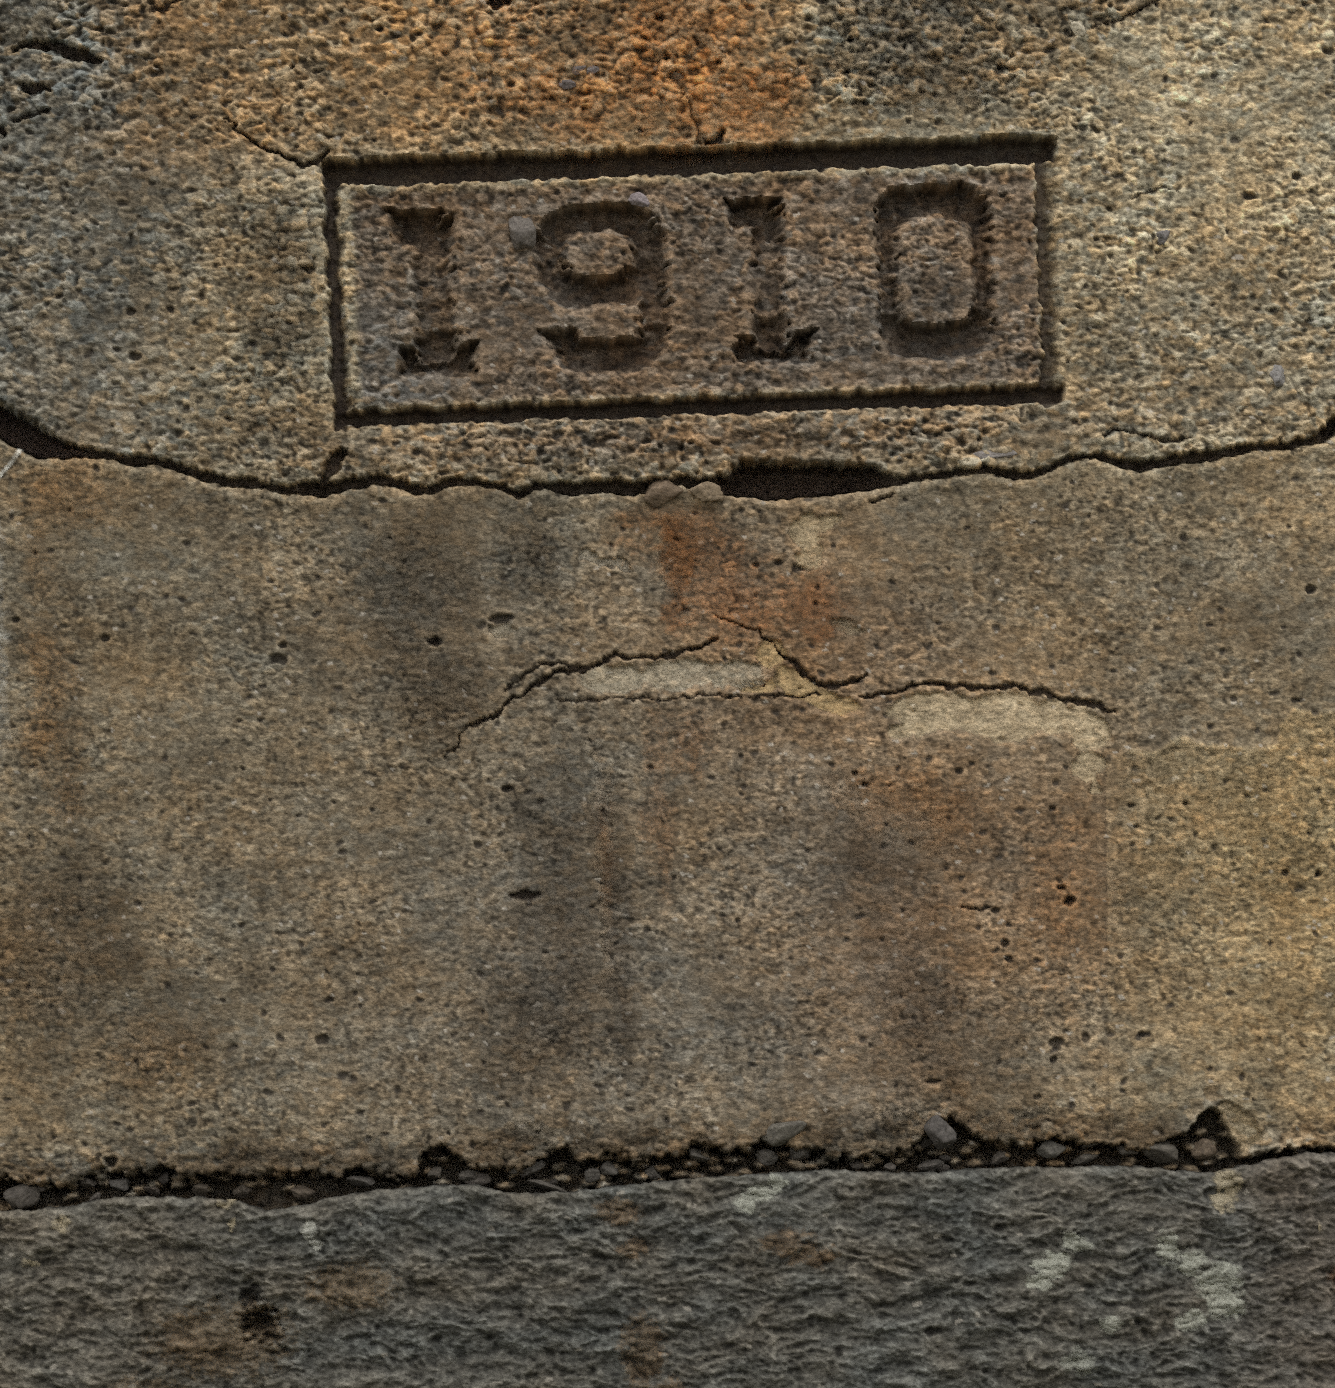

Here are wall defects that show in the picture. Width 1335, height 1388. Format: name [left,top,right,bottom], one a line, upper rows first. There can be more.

crack [0,409,1335,503]
crack [444,619,1115,758]